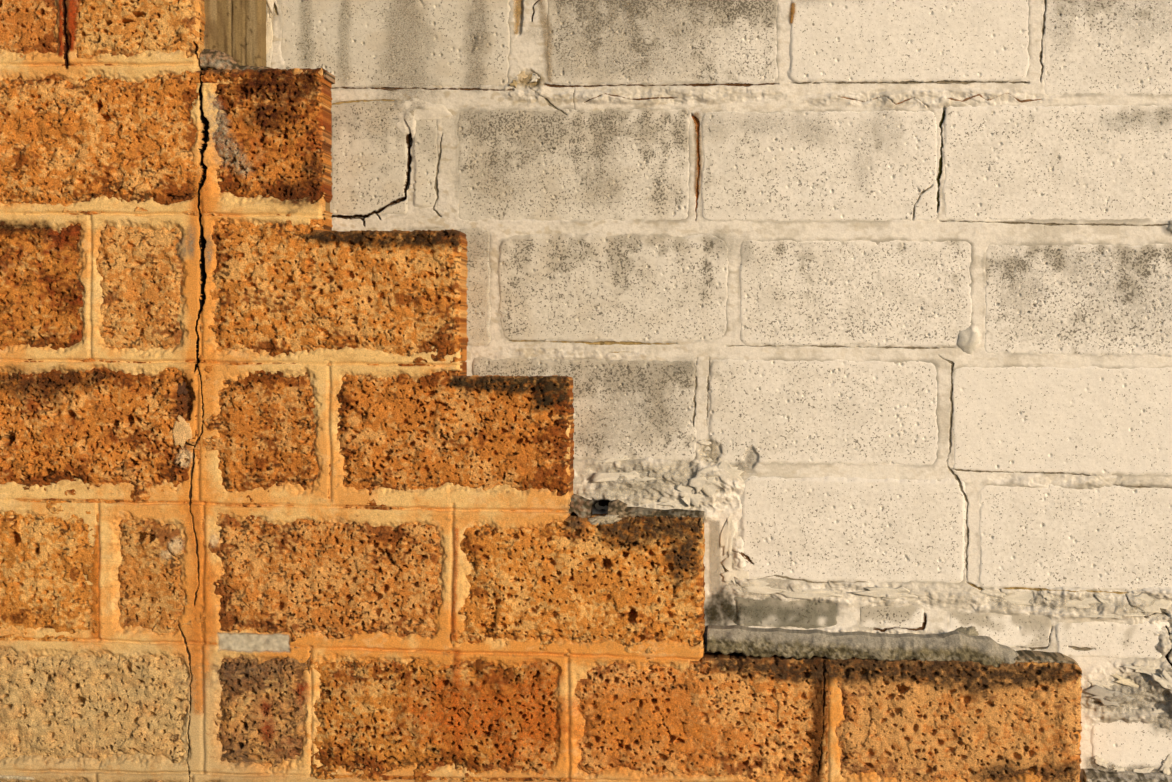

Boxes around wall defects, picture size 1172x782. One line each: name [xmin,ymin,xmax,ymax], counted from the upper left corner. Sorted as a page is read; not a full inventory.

crack [61,0,69,67]
corrosion [58,0,78,56]
crack [331,0,1169,227]
crack [170,42,209,782]
peeling [568,440,754,530]
peeling [980,589,1172,619]
peeling [1082,664,1172,732]
peeling [1089,754,1172,775]